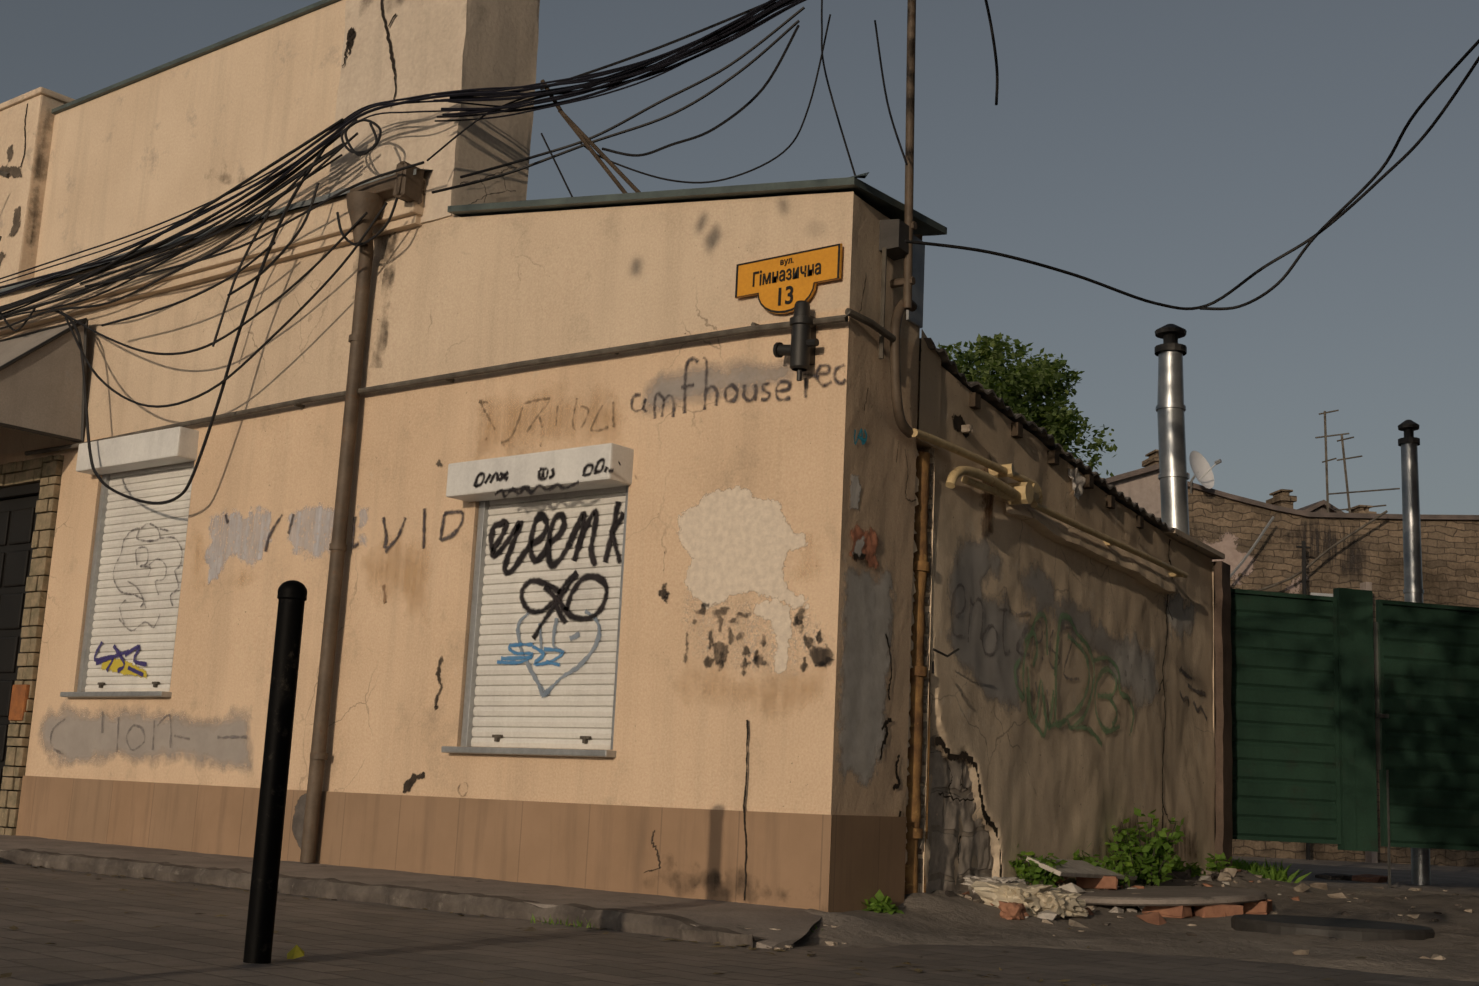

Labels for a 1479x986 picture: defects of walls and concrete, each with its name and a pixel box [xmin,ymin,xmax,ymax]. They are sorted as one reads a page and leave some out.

crack [342,0,397,108]
peeling [678,486,809,674]
flaking render [849,475,878,570]
flaking render [905,447,1002,893]
crack [1159,539,1173,857]
flaking render [1203,532,1254,585]